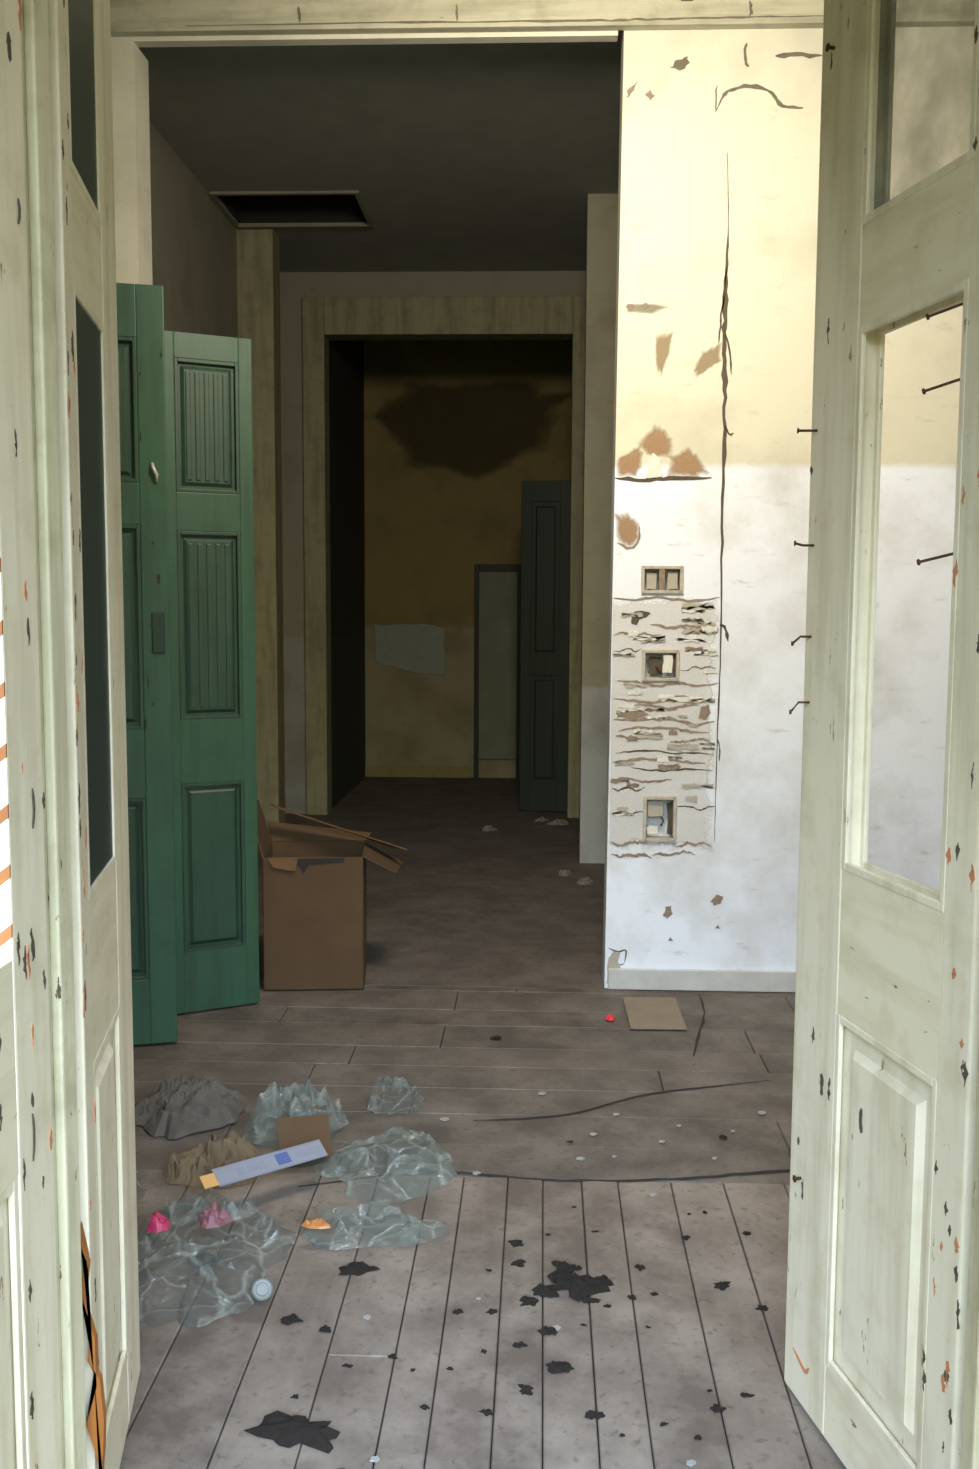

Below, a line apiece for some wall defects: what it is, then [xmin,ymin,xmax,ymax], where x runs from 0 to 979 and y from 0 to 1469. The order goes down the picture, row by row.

peeling [609,596,720,859]
crack [714,152,733,842]